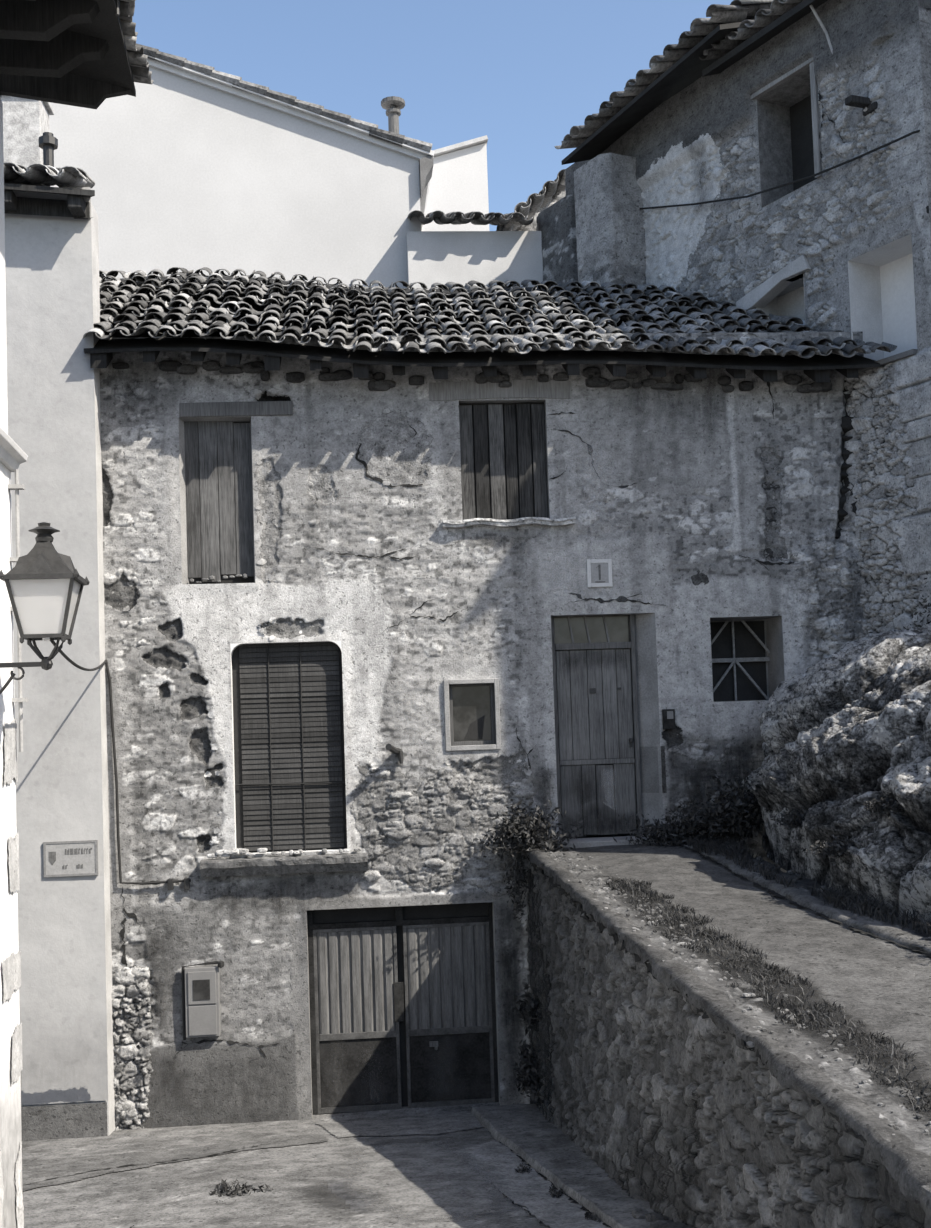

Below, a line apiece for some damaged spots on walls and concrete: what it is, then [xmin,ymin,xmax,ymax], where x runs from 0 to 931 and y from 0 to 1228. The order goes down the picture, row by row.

crack [835,380,857,539]
spalling [104,574,143,611]
spalling [142,618,224,788]
spalling [197,810,222,853]